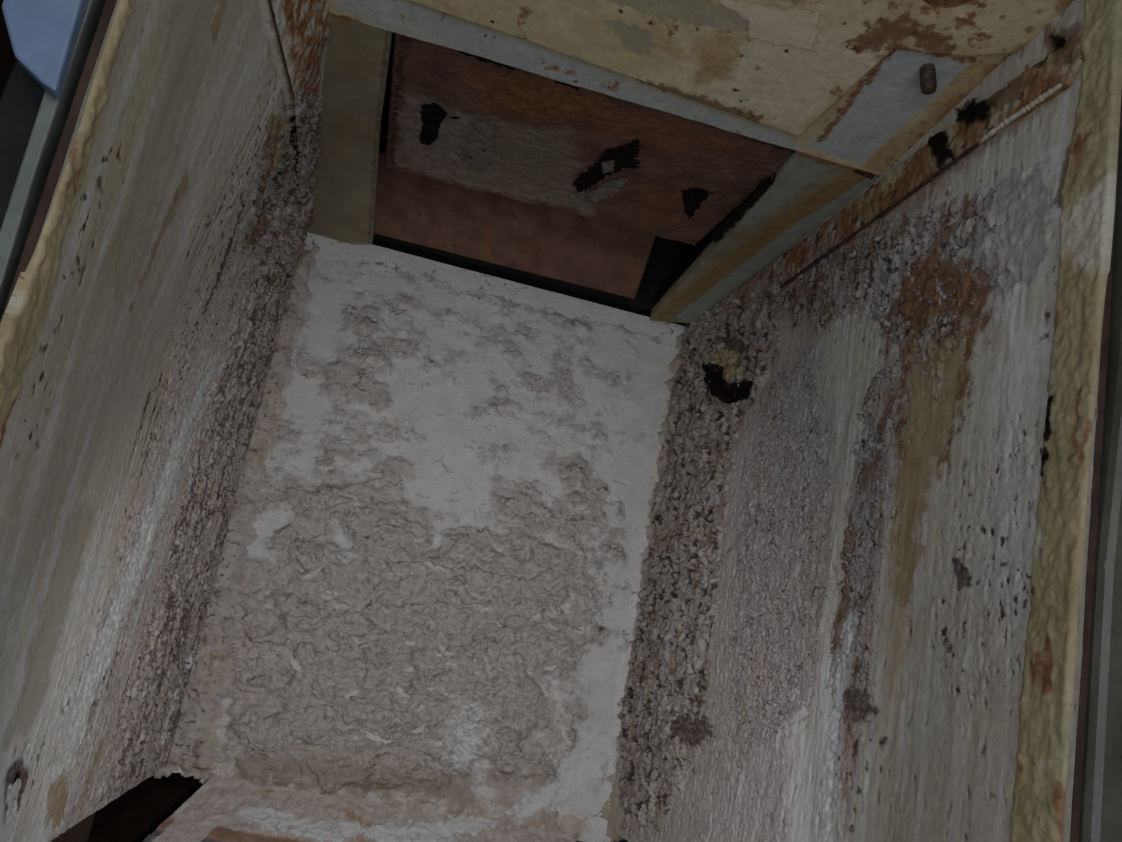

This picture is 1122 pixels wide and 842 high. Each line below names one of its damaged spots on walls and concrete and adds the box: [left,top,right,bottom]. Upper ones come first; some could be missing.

peeling [706,0,820,52]
corrosion [846,14,956,59]
corrosion [1044,24,1080,64]
corrosion [458,50,612,125]
corrosion [639,80,763,123]
peeling [586,160,628,203]
corrosion [890,246,999,606]
peeling [212,259,790,842]
water stain [821,609,857,842]